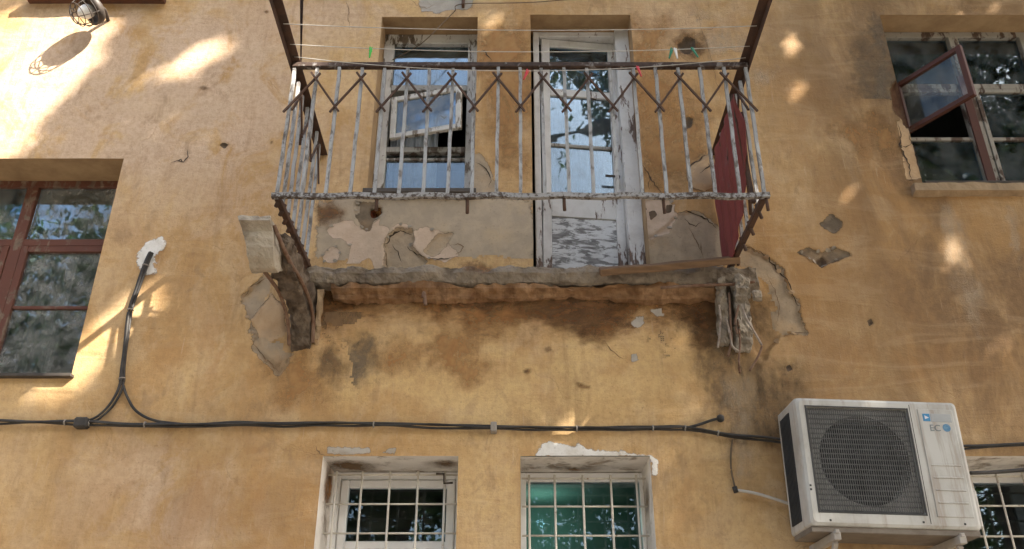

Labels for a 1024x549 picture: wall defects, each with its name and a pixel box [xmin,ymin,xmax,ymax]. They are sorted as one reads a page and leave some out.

damp [633,20,705,186]
spalling [890,81,921,181]
peeling [315,199,533,269]
spalling [645,199,724,266]
spalling [797,246,850,268]
spalling [241,272,294,376]
rust [315,291,380,325]
damp [282,312,480,404]
rust [413,297,641,340]
rust [654,301,717,347]
damp [696,302,798,440]
spalling [717,246,809,374]